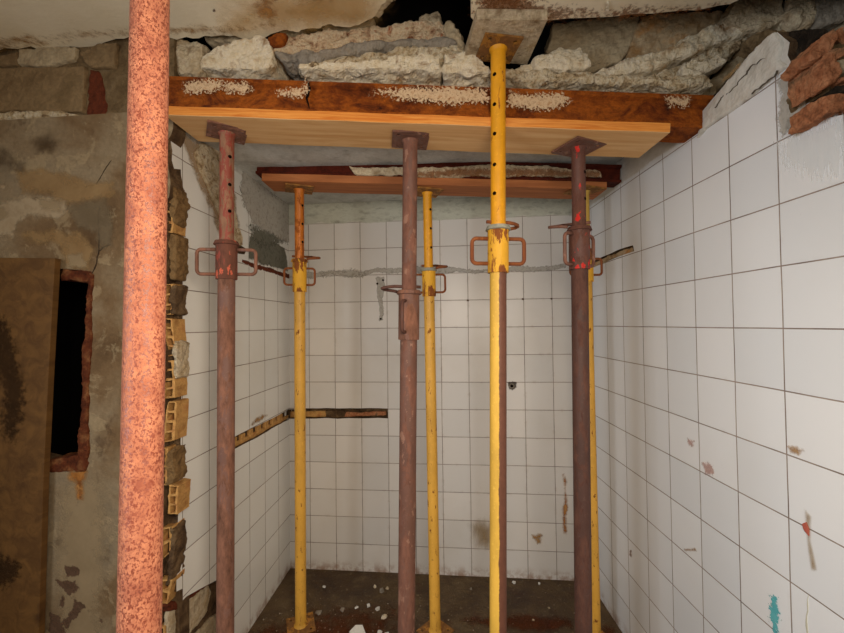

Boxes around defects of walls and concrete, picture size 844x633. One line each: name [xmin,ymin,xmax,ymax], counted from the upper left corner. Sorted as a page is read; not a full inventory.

peeling [323,0,393,32]
corrosion [473,0,716,22]
peeling [205,35,242,49]
peeling [280,29,306,37]
peeling [697,29,828,138]
flaking render [184,136,219,230]